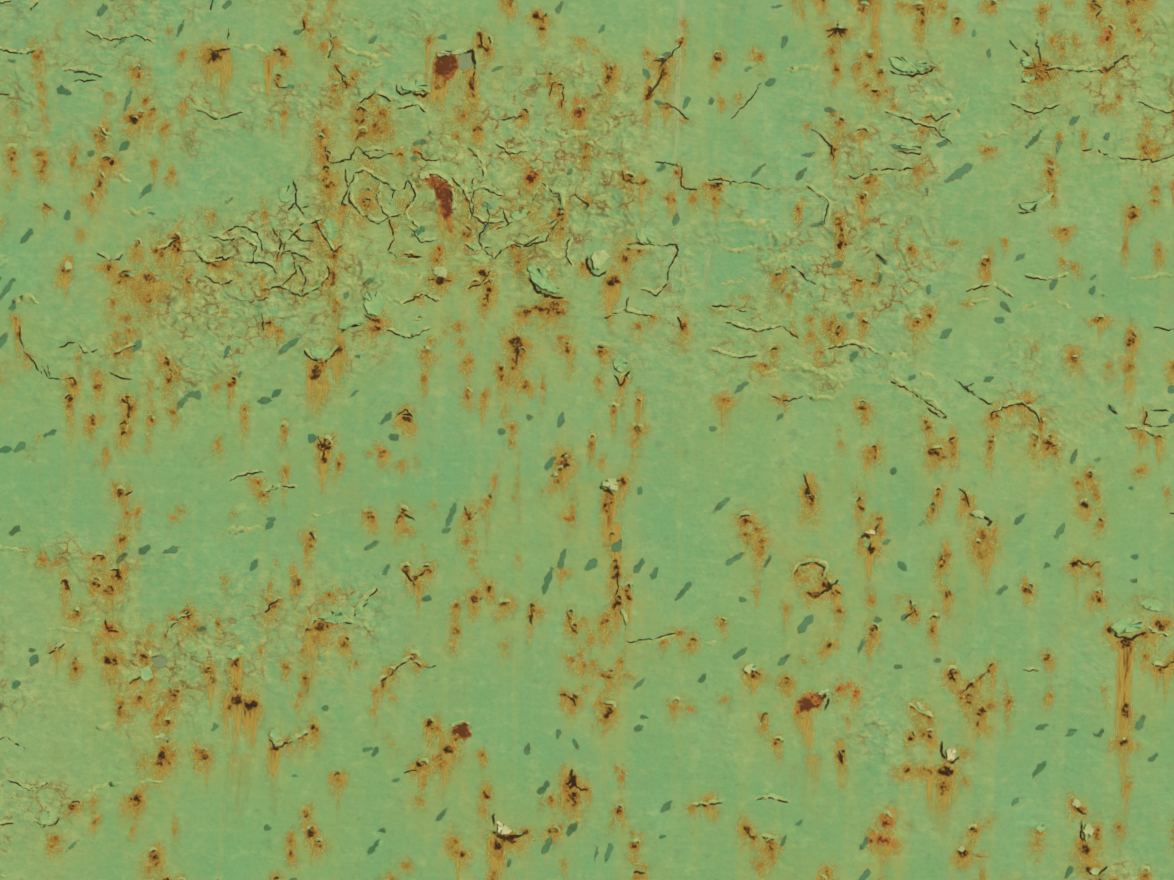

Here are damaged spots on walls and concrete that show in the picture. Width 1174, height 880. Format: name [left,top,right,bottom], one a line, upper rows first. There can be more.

peeling [396,48,481,114]
crack [883,109,952,144]
crack [704,178,774,192]
crack [204,138,575,303]
crack [386,292,441,339]
peeling [512,251,569,330]
crack [710,296,992,420]
corrosion [1088,313,1114,331]
corrosion [1105,322,1141,391]
peeling [1103,598,1172,788]
peeling [537,765,591,836]
peeling [485,814,532,880]